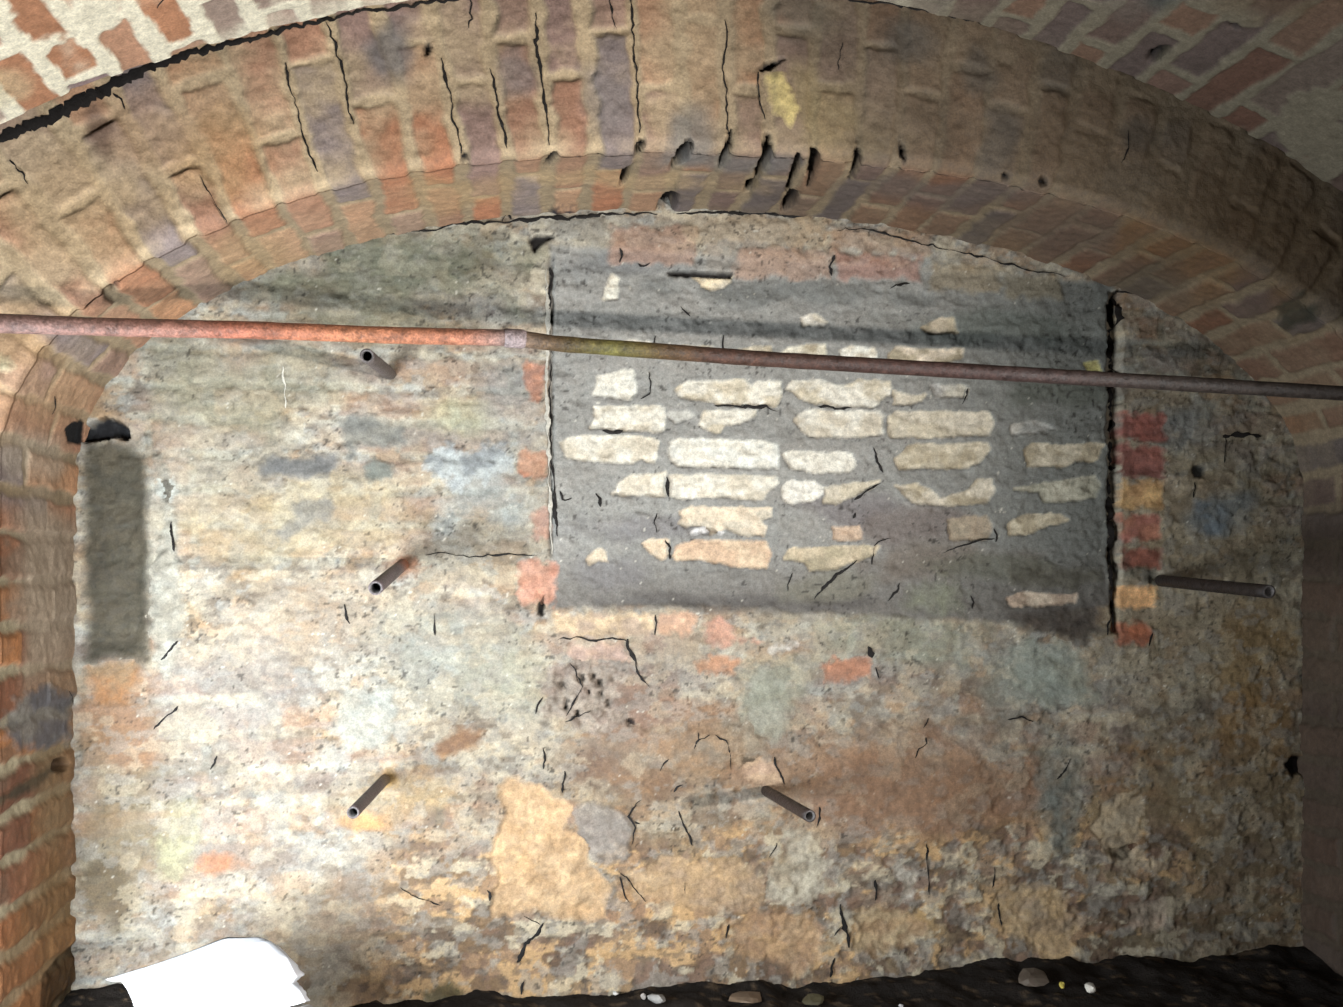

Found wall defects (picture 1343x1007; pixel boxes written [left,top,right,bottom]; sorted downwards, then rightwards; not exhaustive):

crack [0,0,473,184]
crack [534,13,550,145]
crack [609,0,641,133]
flaking render [526,234,556,304]
spalling [665,269,735,292]
peeling [737,312,966,362]
spalling [63,416,131,446]
crack [429,267,602,558]
peeling [516,368,1169,649]
crack [1105,290,1132,635]
crack [535,615,657,722]
spalling [488,774,834,981]